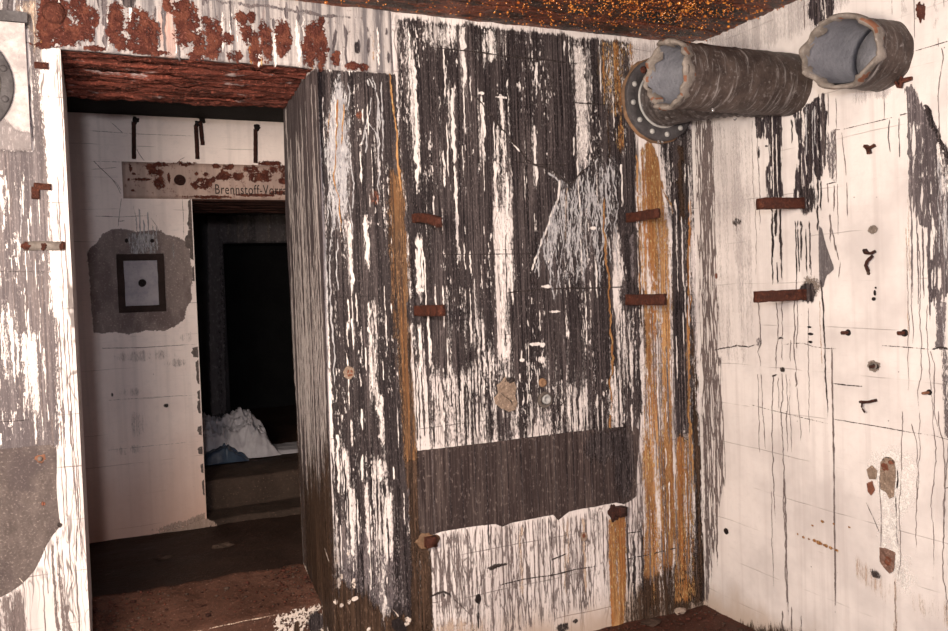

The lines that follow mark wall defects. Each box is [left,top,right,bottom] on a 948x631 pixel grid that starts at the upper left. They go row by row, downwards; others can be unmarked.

damp [122,0,136,21]
corrosion [29,0,369,72]
corrosion [127,160,285,199]
damp [0,0,84,631]
damp [202,0,725,631]
corrosion [635,143,705,603]
damp [740,93,848,631]
damp [869,44,948,630]
peeling [0,445,62,597]
corrosion [608,517,627,626]
spalling [867,457,899,538]
spalling [870,547,896,579]